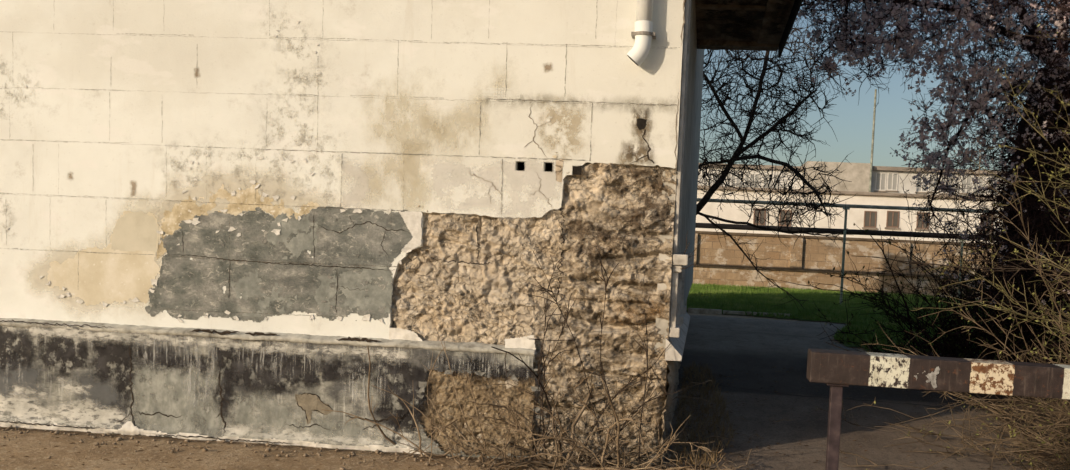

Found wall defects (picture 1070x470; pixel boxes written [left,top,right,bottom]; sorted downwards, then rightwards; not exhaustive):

crack [632,100,679,183]
peeling [32,154,413,324]
crack [428,174,502,265]
crack [525,105,565,329]
damp [3,326,409,359]
damp [0,378,130,429]
spalling [0,362,546,457]
damp [224,425,429,451]